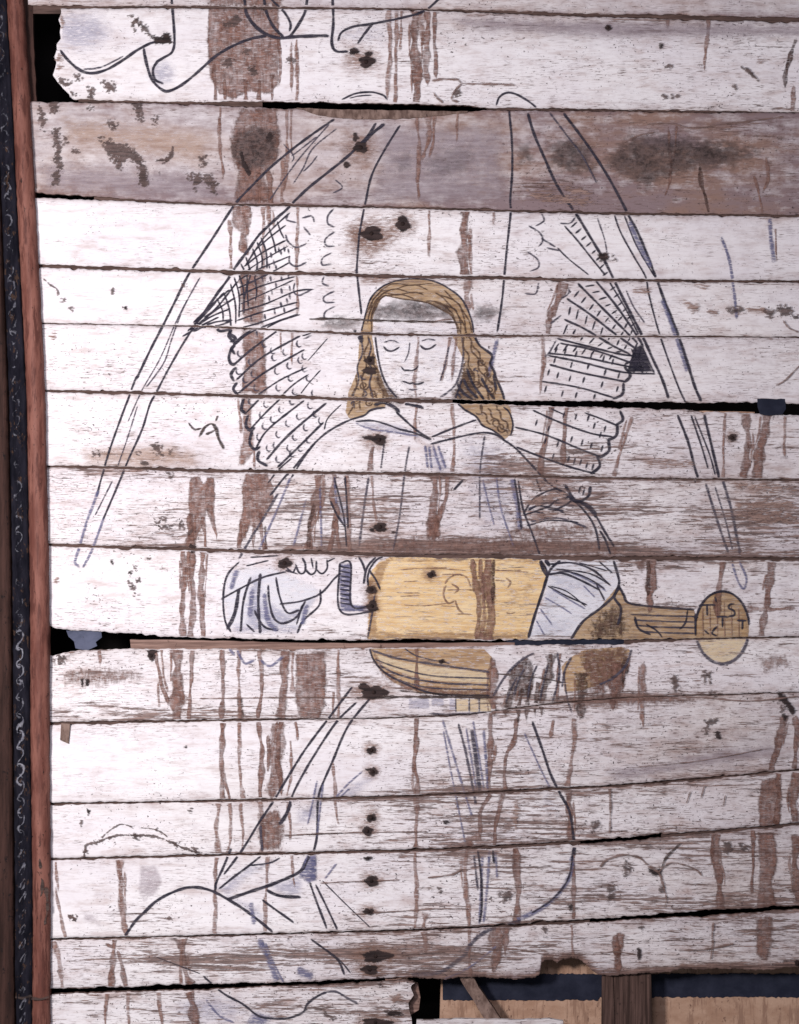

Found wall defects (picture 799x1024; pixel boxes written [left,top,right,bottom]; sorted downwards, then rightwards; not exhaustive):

damp [207,0,299,550]
damp [612,127,736,211]